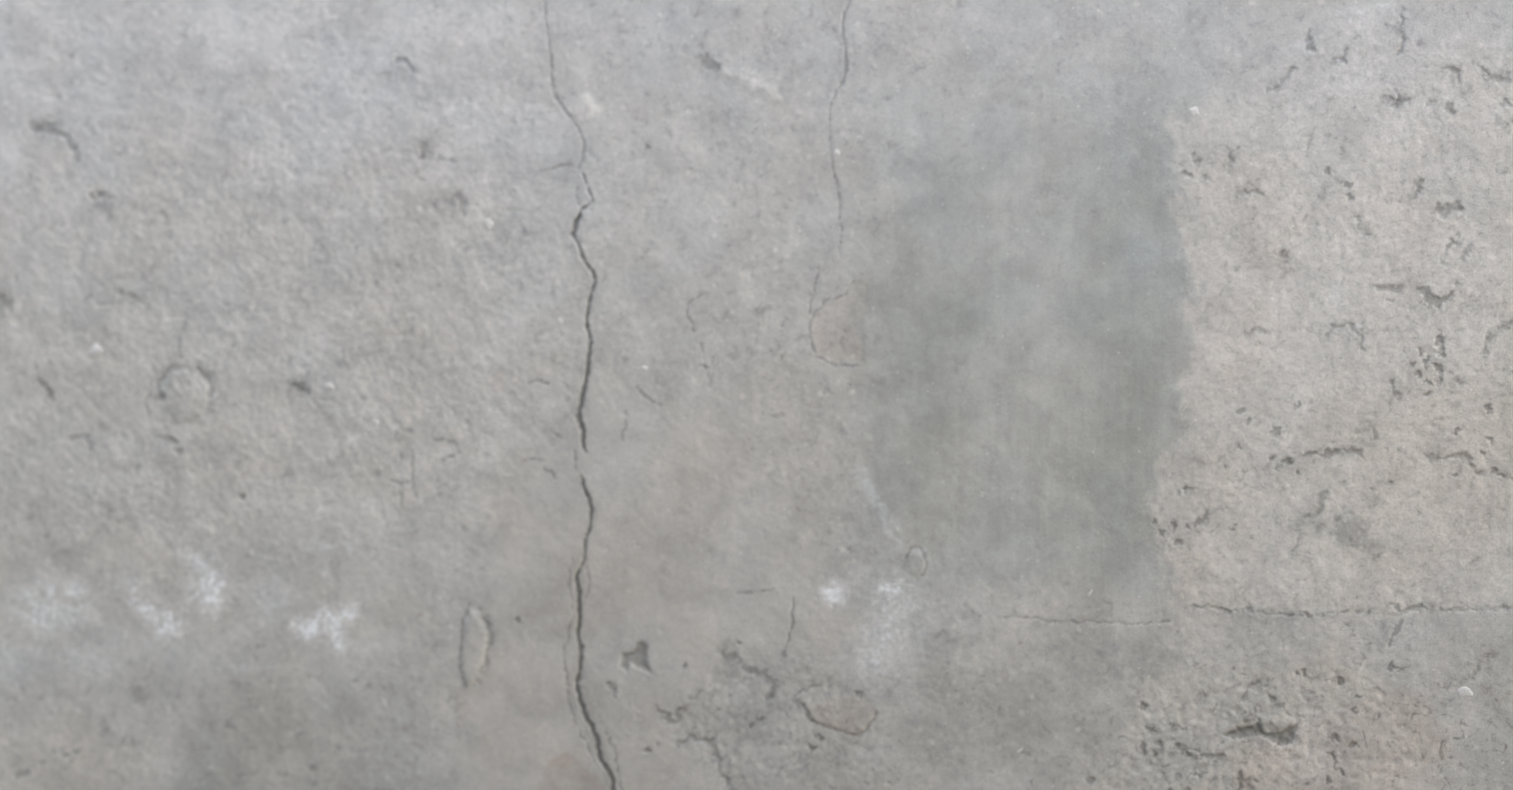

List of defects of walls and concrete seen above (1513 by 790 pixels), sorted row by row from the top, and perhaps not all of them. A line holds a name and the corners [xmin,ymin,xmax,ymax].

crack [827,0,856,257]
crack [522,0,663,790]
water stain [811,51,1240,790]
flaking render [638,588,894,790]
crack [1000,596,1513,649]